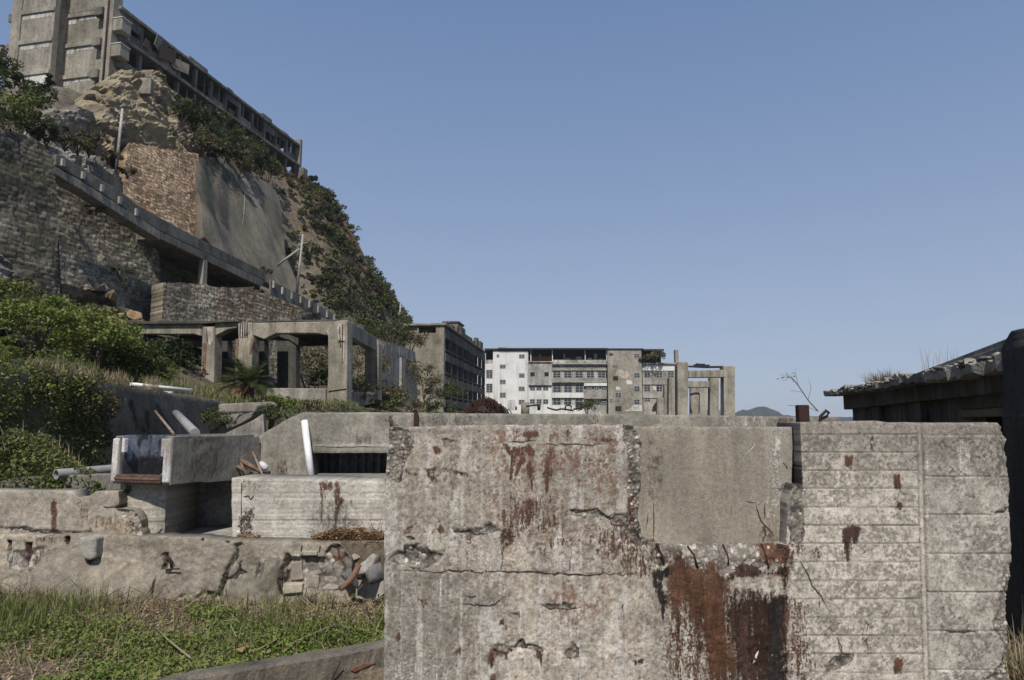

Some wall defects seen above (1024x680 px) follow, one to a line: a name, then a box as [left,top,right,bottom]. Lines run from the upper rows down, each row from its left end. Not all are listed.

spalling [386,427,414,483]
corrosion [8,500,70,565]
spalling [161,553,180,572]
crack [179,483,254,597]
spalling [280,543,352,602]
corrosion [319,481,344,529]
crack [391,531,647,606]
crack [570,503,654,546]
corrosion [498,429,822,680]
spalling [570,424,805,576]
corrosion [842,525,861,561]
corrosion [894,474,902,510]